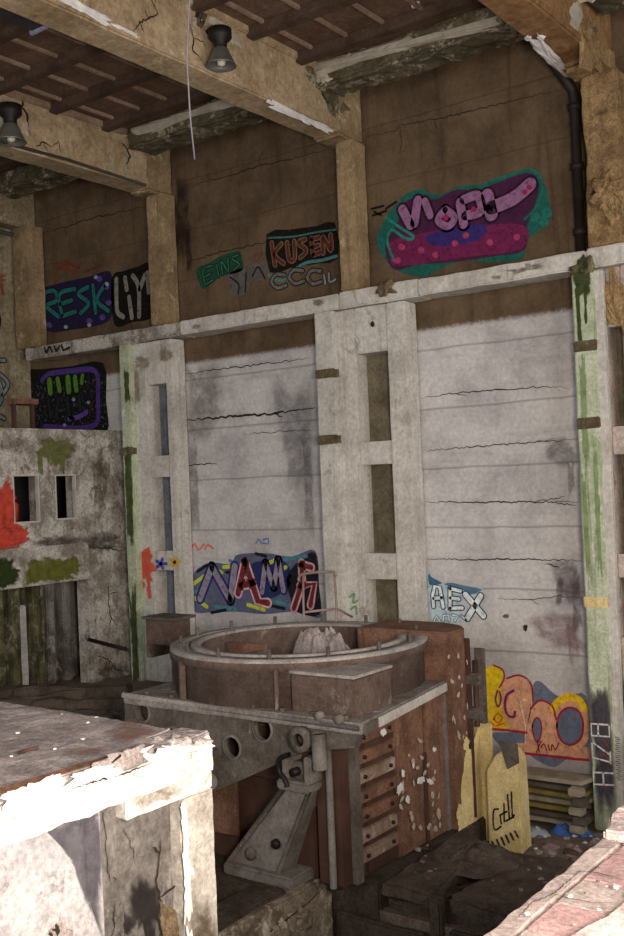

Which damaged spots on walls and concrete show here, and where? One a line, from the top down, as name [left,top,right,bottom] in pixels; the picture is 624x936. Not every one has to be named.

peeling [524,33,574,81]
spalling [569,0,602,73]
spalling [588,167,624,226]
leakage [575,284,588,341]
crack [425,386,567,398]
crack [426,438,572,451]
crack [427,496,580,506]
leakage [0,560,38,588]
peeling [0,736,215,820]
leakage [113,880,159,936]